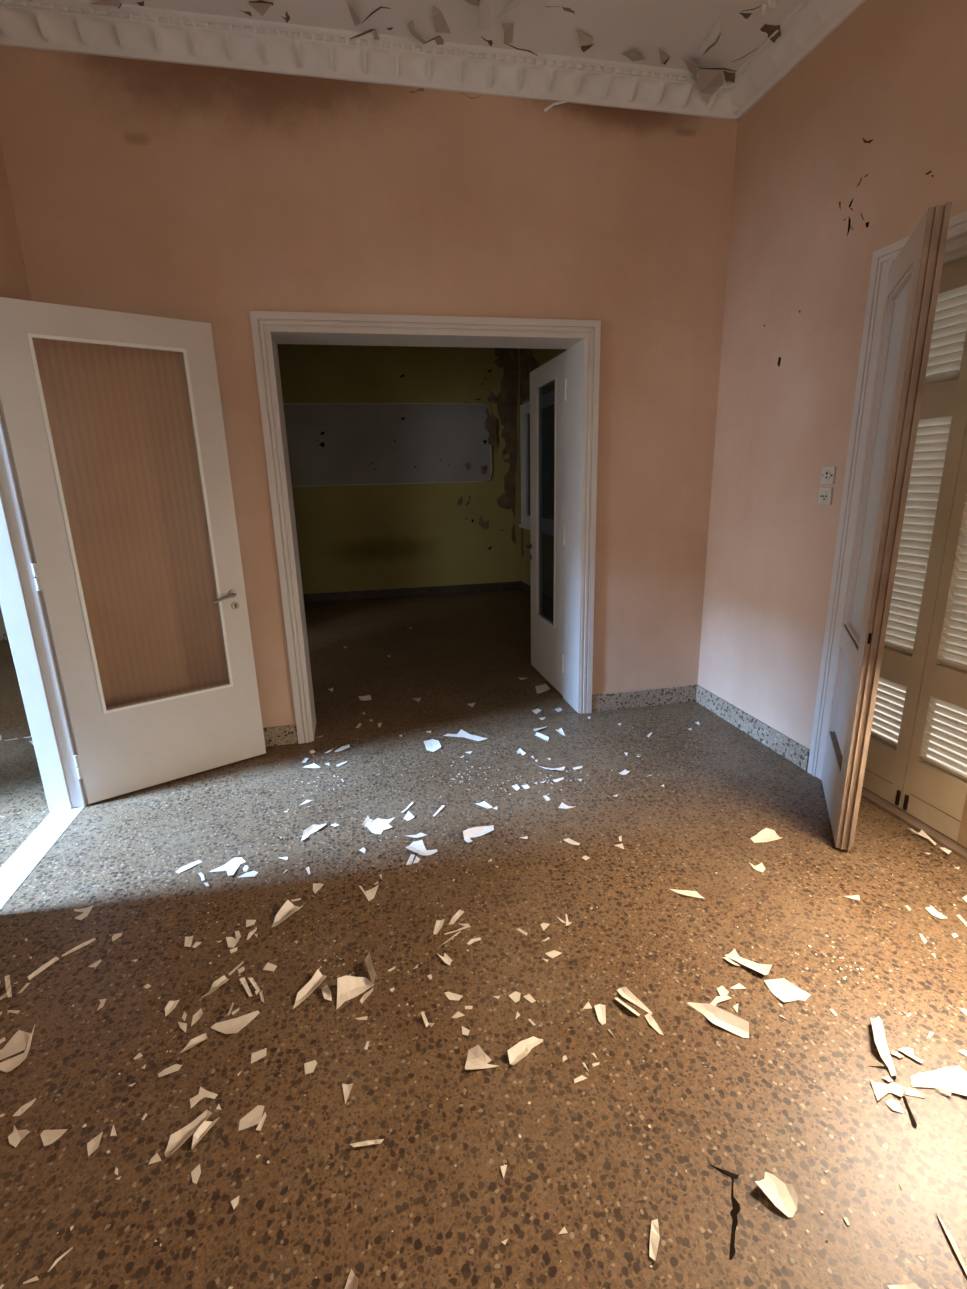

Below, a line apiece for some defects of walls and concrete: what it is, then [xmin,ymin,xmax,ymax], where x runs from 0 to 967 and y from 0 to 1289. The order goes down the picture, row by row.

peeling [92,0,144,9]
peeling [242,0,290,23]
peeling [346,1,451,45]
peeling [481,24,538,56]
peeling [576,30,594,52]
peeling [621,21,735,103]
peeling [735,0,781,43]
crack [870,1066,917,1129]
crack [711,1165,740,1260]